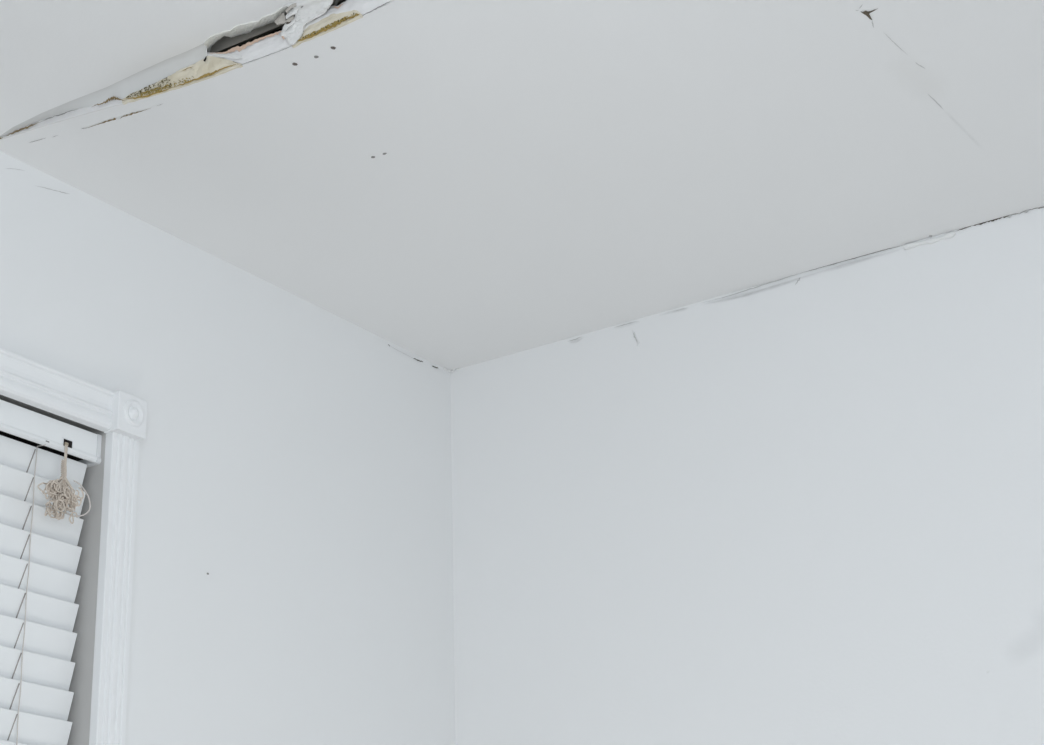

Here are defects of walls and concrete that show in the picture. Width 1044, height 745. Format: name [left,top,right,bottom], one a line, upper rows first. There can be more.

spalling [204,3,303,52]
crack [959,207,1044,230]